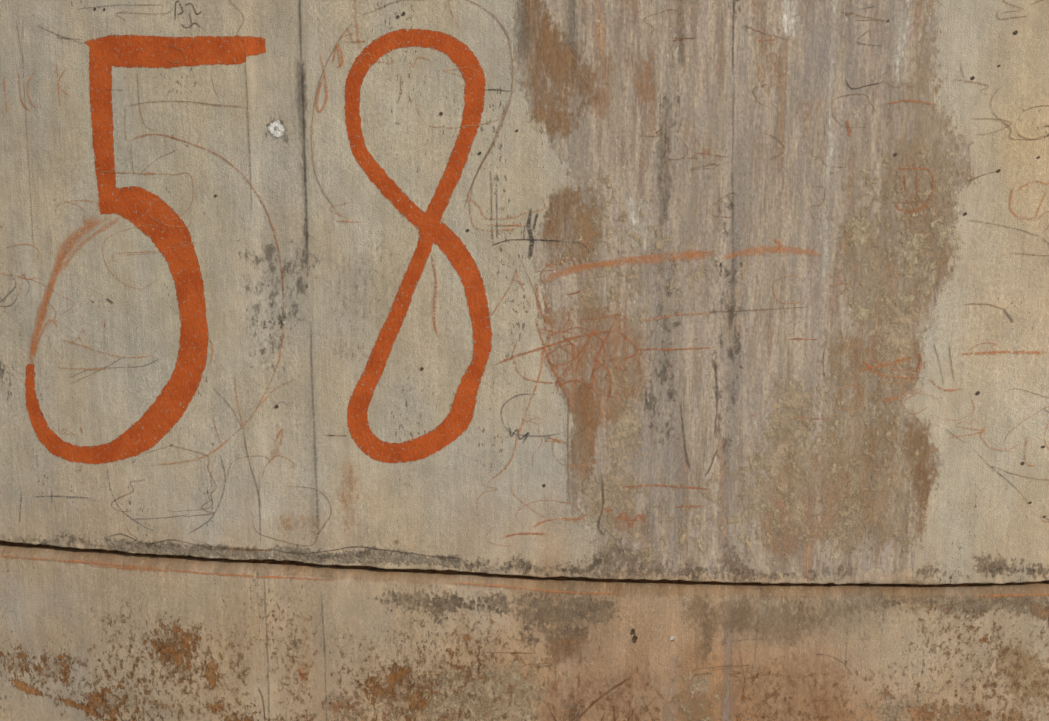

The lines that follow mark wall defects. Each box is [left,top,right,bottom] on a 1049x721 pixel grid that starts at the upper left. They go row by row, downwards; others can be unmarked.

damp [504,537,668,579]
damp [680,544,797,582]
corrosion [142,618,222,695]
corrosion [875,699,1025,721]